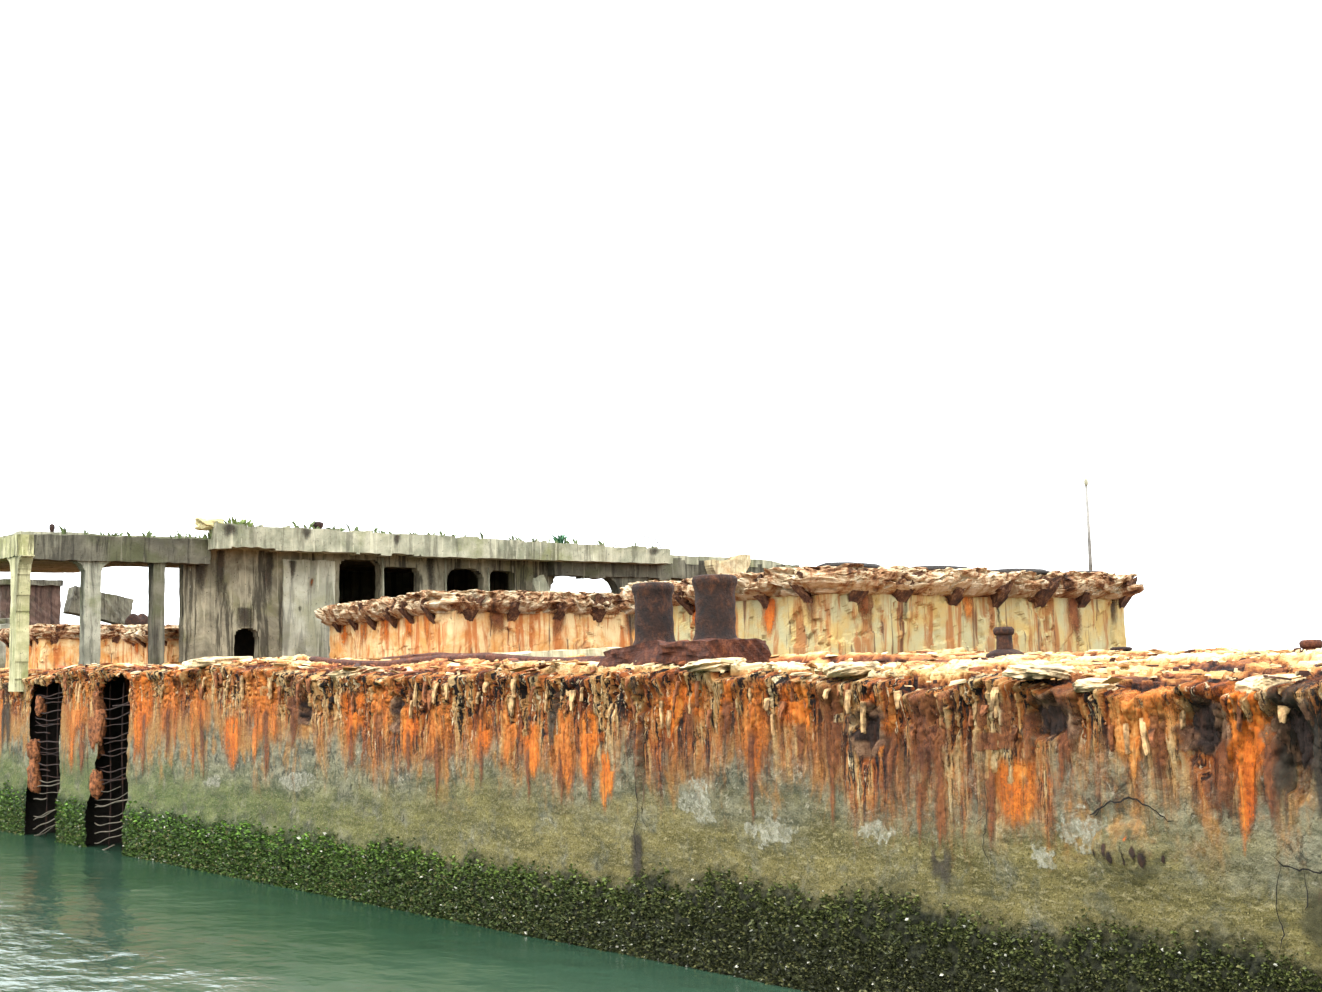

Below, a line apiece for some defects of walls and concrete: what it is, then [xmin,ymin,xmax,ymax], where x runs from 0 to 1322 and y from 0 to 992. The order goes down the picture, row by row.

spalling [25,676,85,836]
spalling [84,675,130,851]
rust [309,613,614,807]
rust [655,681,844,820]
spalling [823,683,902,758]
peeling [968,687,1000,726]
rust [1110,686,1176,779]
rust [1216,681,1296,839]
water stain [1267,683,1322,813]
water stain [631,834,642,876]
water stain [744,811,796,849]
water stain [1032,846,1054,869]